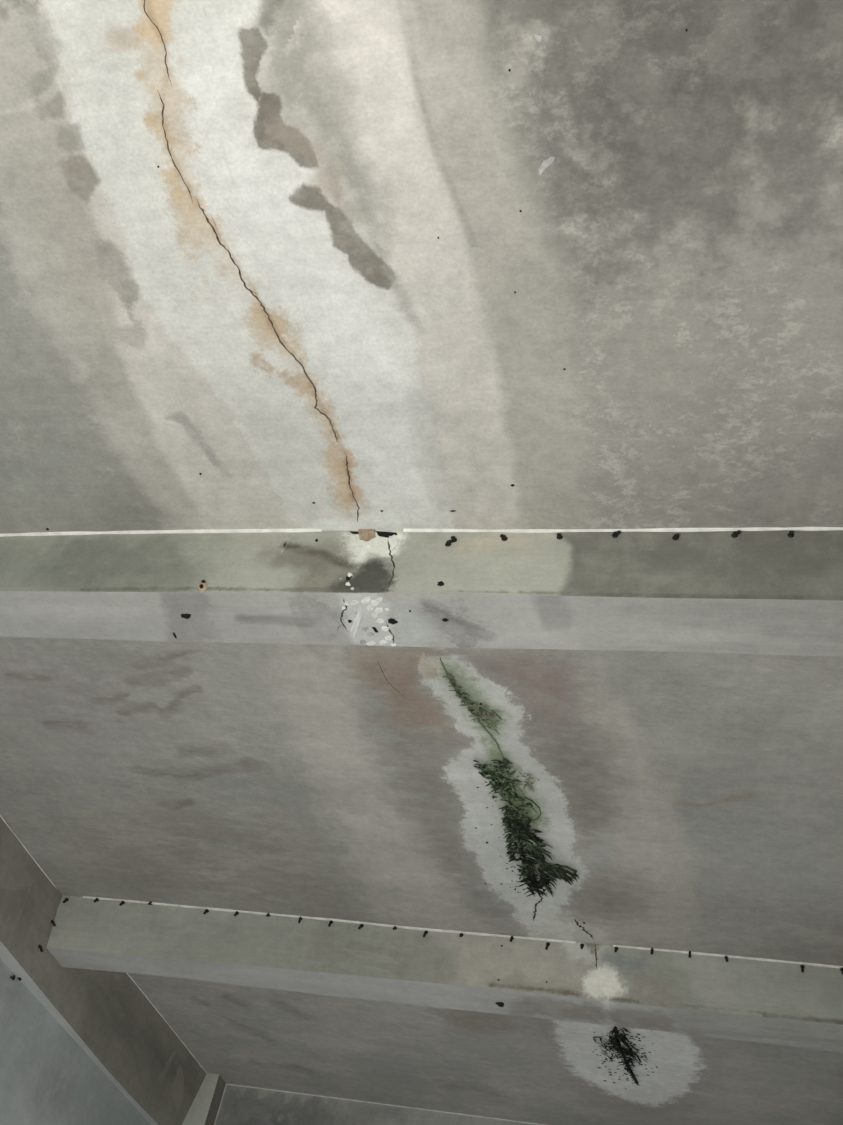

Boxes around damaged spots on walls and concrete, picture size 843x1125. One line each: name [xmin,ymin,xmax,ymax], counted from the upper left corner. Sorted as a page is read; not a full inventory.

corrosion [84,0,391,509]
crack [143,0,360,522]
damp [0,0,843,577]
damp [0,530,843,966]
damp [205,915,843,1125]